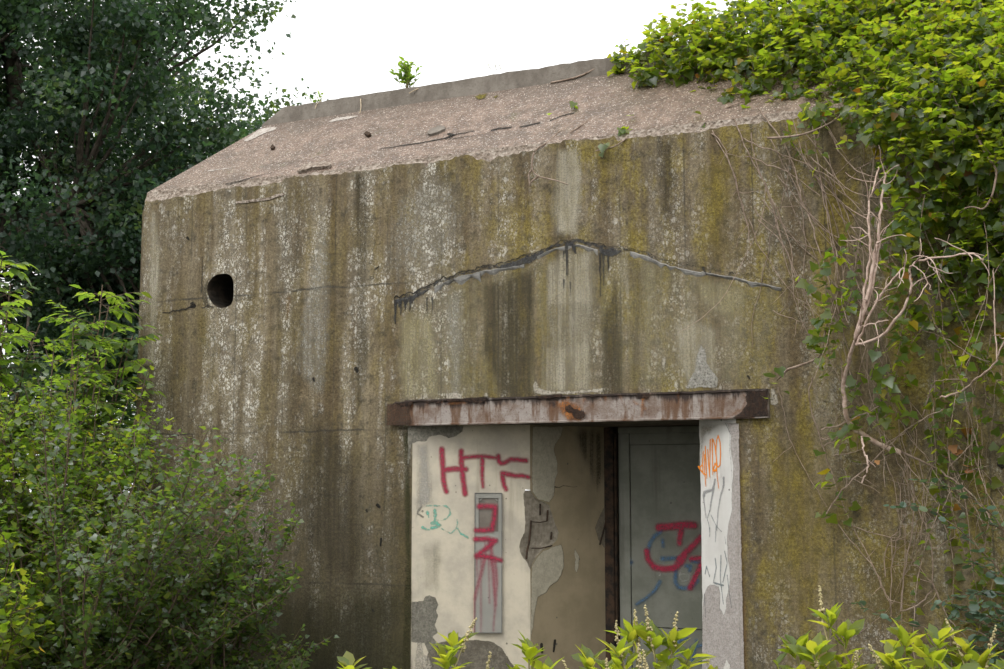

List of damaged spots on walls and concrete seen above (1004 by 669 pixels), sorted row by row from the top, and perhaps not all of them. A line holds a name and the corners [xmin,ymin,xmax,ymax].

damp [557,150,579,233]
damp [150,215,159,362]
damp [487,274,531,395]
damp [547,254,590,391]
crack [394,239,782,324]
rust [387,401,413,426]
rust [536,394,585,420]
rust [733,390,768,418]
damp [404,448,429,669]
spalling [519,490,579,634]
peeling [702,423,744,669]
peeling [411,595,514,669]